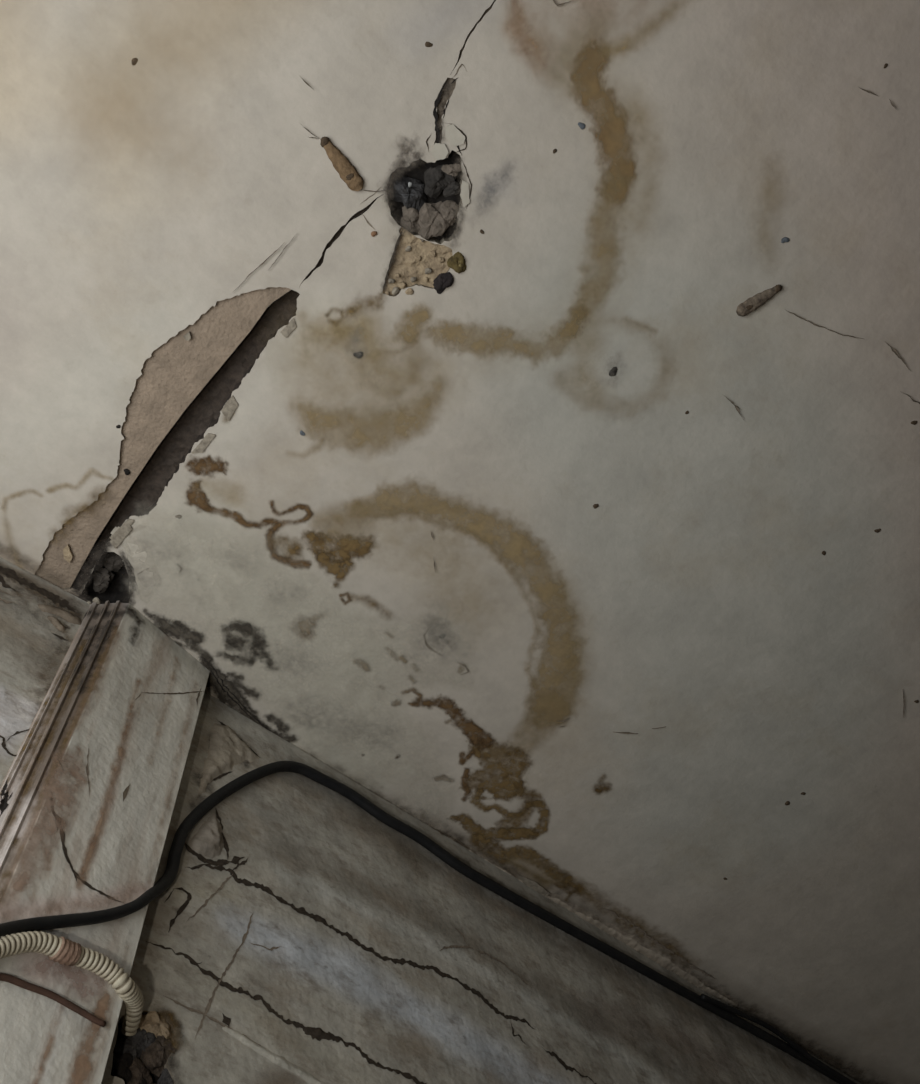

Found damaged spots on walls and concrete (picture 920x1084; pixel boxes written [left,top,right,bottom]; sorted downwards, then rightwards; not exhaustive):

crack [450,0,496,76]
crack [299,188,385,288]
hole [382,77,472,297]
water stain [571,41,636,259]
water stain [398,282,605,357]
crack [789,312,920,404]
spalling [34,287,291,693]
water stain [143,609,296,742]
water stain [333,483,579,726]
crack [48,745,125,904]
hole [111,1011,181,1084]
crack [146,858,596,1084]